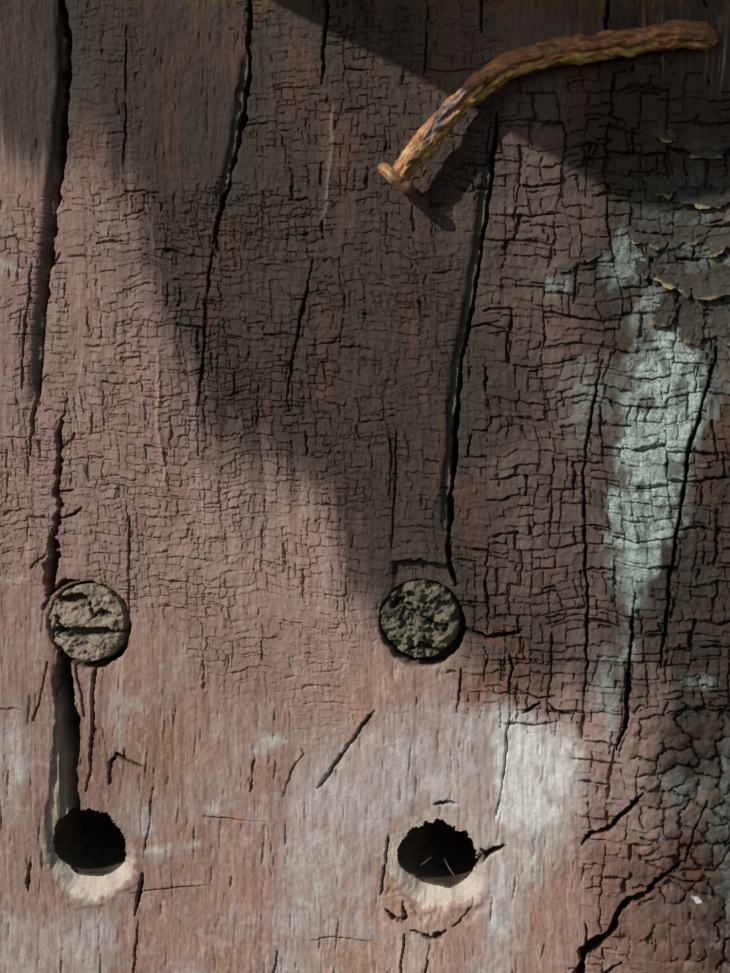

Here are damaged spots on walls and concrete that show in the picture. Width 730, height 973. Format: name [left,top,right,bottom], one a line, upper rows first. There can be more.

crack [0,0,518,671]
damp [605,331,707,611]